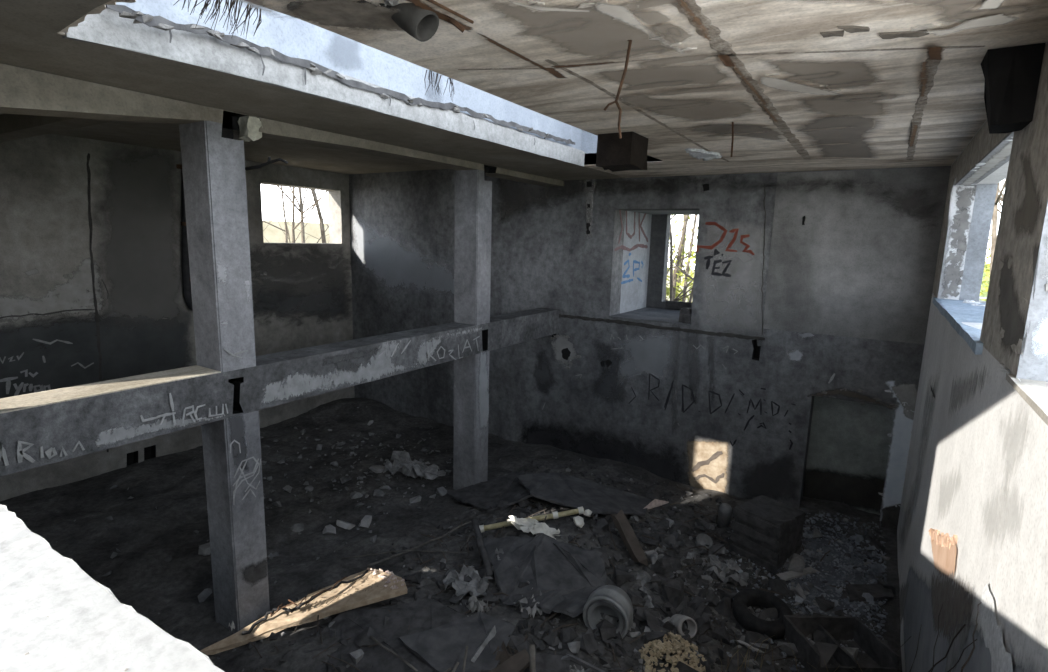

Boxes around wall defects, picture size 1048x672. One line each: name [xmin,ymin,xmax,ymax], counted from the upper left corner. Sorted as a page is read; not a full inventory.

leakage [239,0,272,12]
spalling [287,0,404,31]
leakage [904,0,1030,22]
leakage [493,0,782,140]
peeling [762,74,841,95]
leakage [770,60,897,158]
rust [920,47,942,96]
peeling [685,148,722,161]
peeling [932,137,1048,354]
flaking render [261,327,482,404]